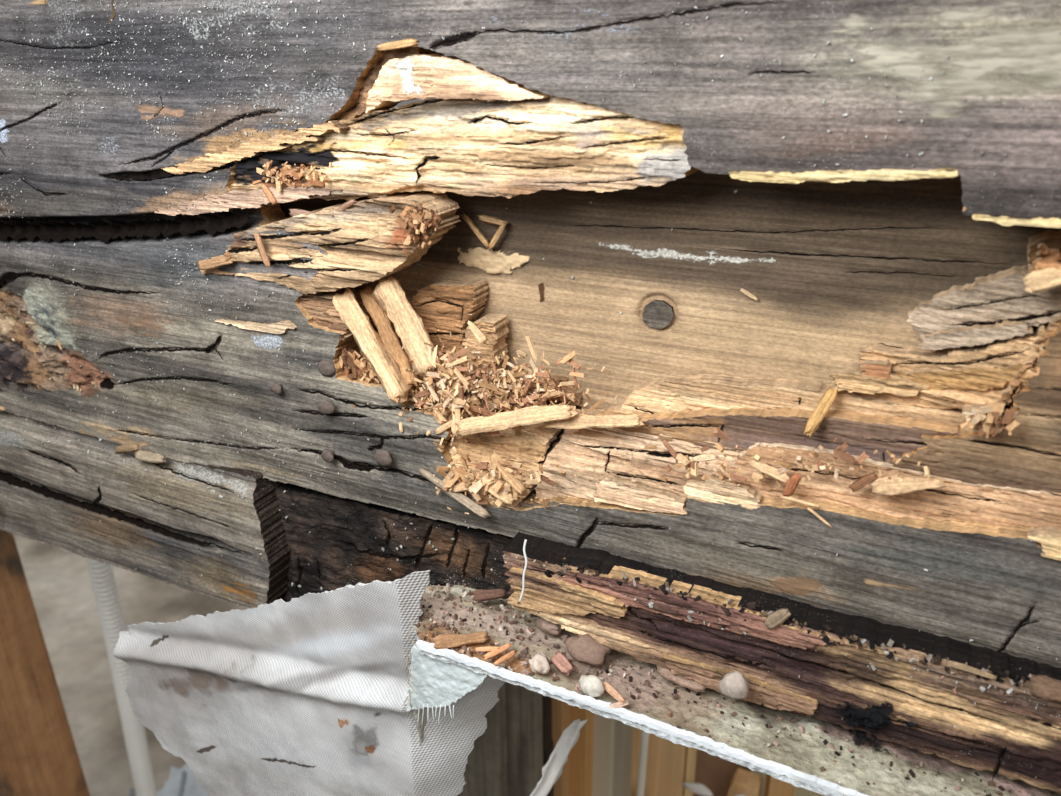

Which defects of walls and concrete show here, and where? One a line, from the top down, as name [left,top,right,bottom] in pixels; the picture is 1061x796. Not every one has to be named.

crack [0,38,129,57]
crack [429,1,786,48]
crack [99,99,681,184]
crack [0,101,376,279]
crack [0,272,159,295]
water stain [0,342,32,392]
crack [96,336,233,389]
crack [735,543,782,551]
crack [623,598,1061,781]
water stain [836,701,917,754]